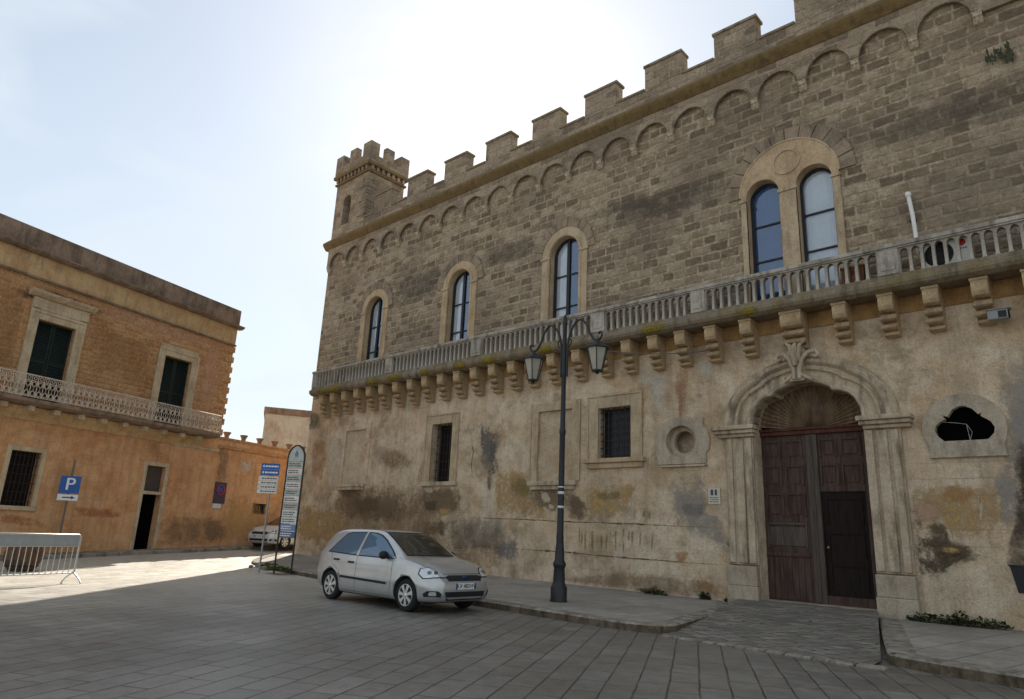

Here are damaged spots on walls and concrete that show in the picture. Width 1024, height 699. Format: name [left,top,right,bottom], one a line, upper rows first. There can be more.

water stain [481,428,544,518]
water stain [1004,370,1024,565]
water stain [298,490,474,560]